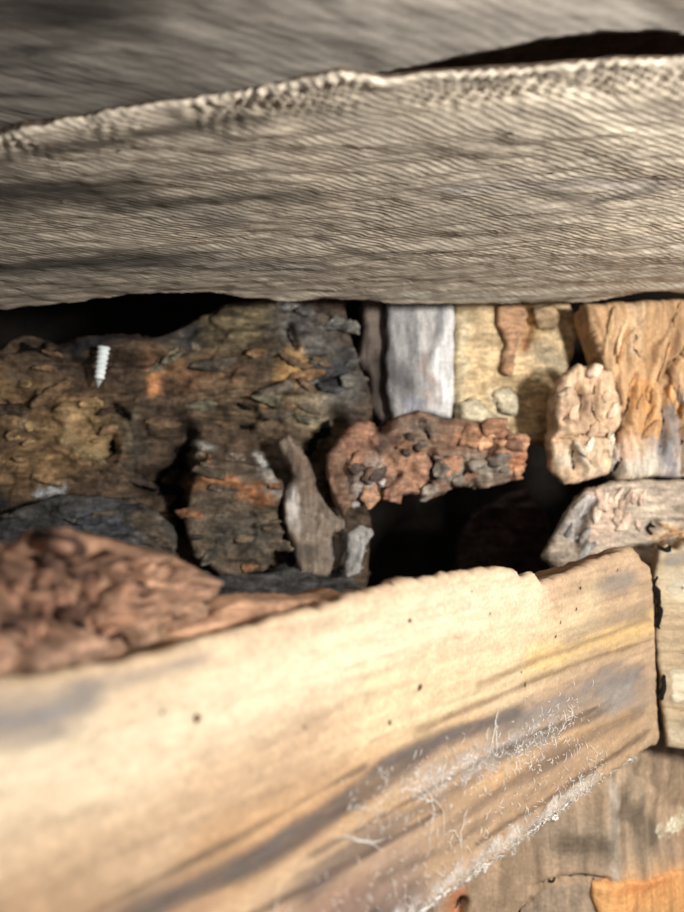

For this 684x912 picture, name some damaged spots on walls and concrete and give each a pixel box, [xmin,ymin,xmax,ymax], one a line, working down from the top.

leakage [0,685,92,731]
leakage [125,696,572,912]
leakage [539,771,595,822]
crack [543,874,600,883]